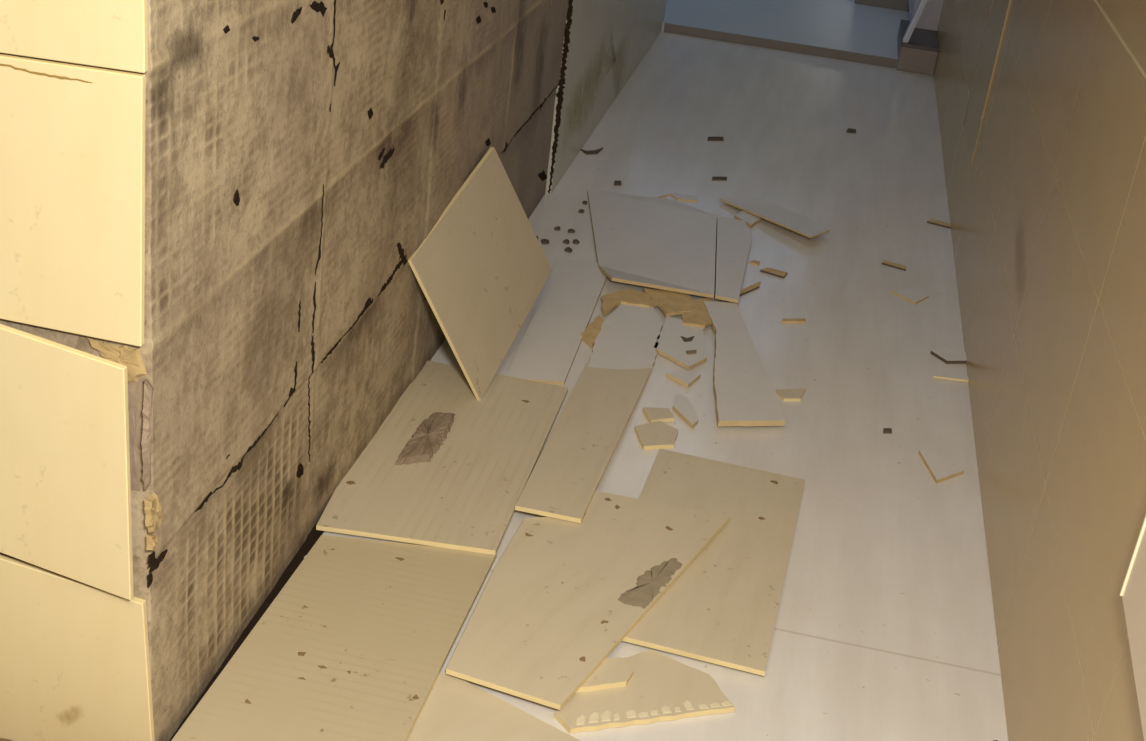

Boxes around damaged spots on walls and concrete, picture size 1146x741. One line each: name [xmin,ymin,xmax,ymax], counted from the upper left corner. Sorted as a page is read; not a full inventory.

spalling [291,1,327,24]
crack [327,0,340,112]
spalling [378,147,395,169]
crack [195,184,408,512]
crack [149,549,168,573]